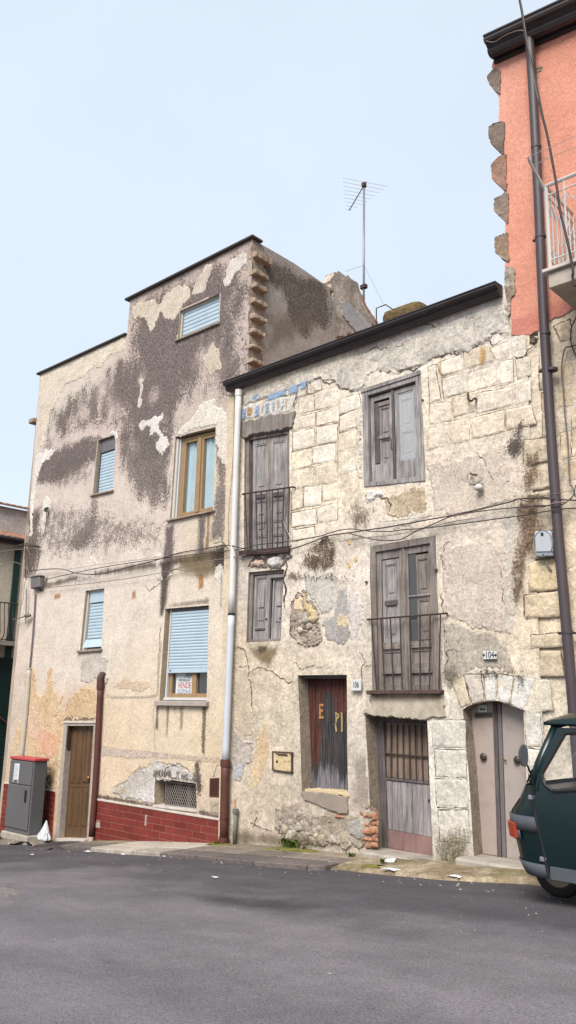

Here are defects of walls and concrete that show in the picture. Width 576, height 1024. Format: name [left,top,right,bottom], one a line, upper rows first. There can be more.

peeling [132,264,213,331]
water stain [265,254,334,339]
water stain [24,246,250,616]
peeling [137,378,227,467]
water stain [241,398,286,419]
water stain [502,415,546,605]
spalling [248,554,365,648]
mould [285,529,355,584]
peeling [365,450,516,681]
crack [234,647,322,707]
peeling [7,651,153,796]
spalling [113,758,195,826]